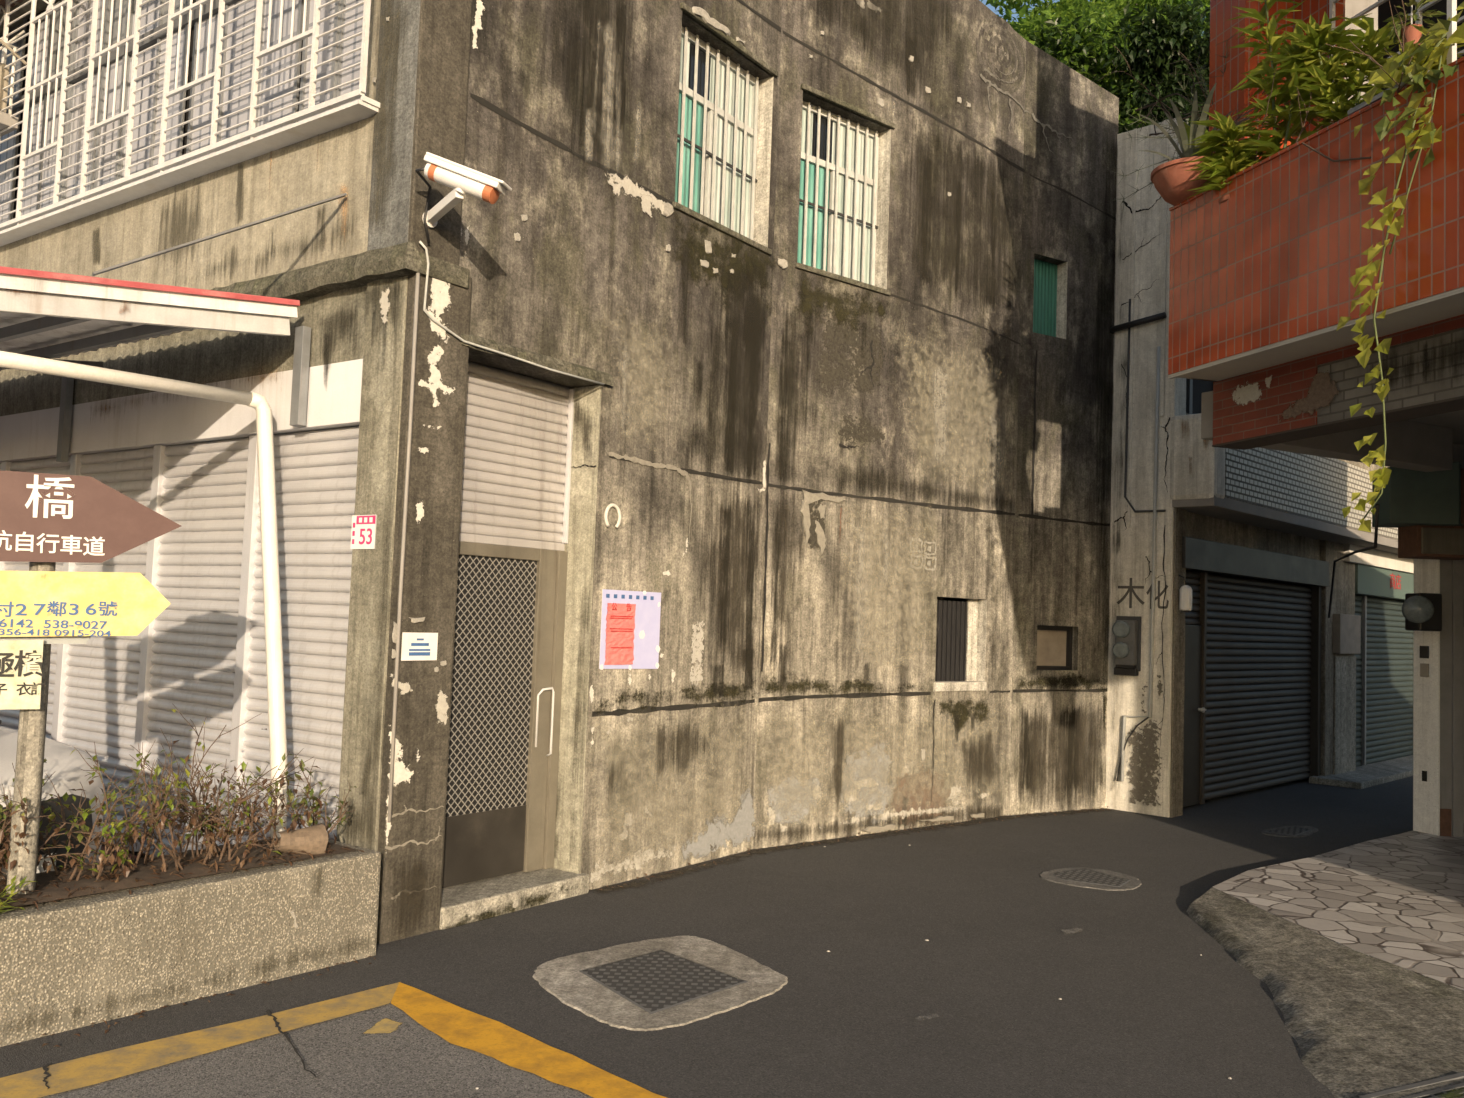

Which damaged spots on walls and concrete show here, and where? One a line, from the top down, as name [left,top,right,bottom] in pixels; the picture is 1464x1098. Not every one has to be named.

leakage [817,0,952,92]
spalling [606,171,674,218]
leakage [911,132,1013,308]
crack [1121,196,1162,306]
peeling [418,278,455,407]
crack [1121,364,1170,492]
spalling [1231,375,1272,406]
peeling [416,500,424,524]
leakage [574,273,914,749]
leakage [1018,599,1119,803]
crack [1114,505,1166,777]
leakage [758,715,1000,840]